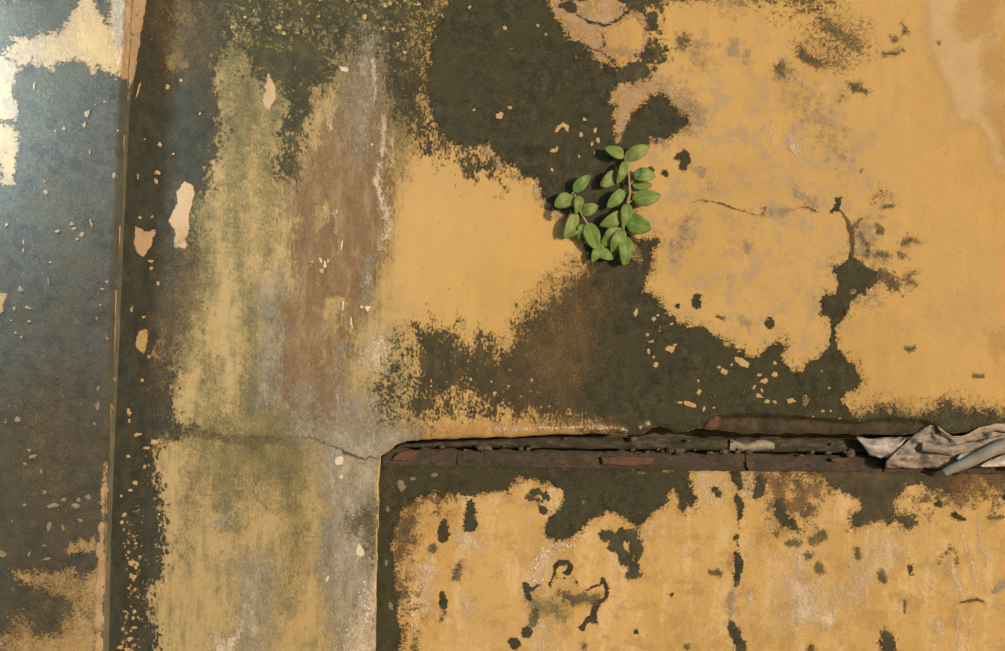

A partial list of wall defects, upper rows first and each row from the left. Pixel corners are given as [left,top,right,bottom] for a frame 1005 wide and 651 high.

spalling [107,0,146,99]
damp [676,31,694,51]
damp [649,148,692,177]
peeling [169,181,195,249]
crack [698,190,862,256]
peeling [134,226,156,257]
damp [692,293,703,310]
peeling [135,329,148,353]
crack [158,425,375,460]